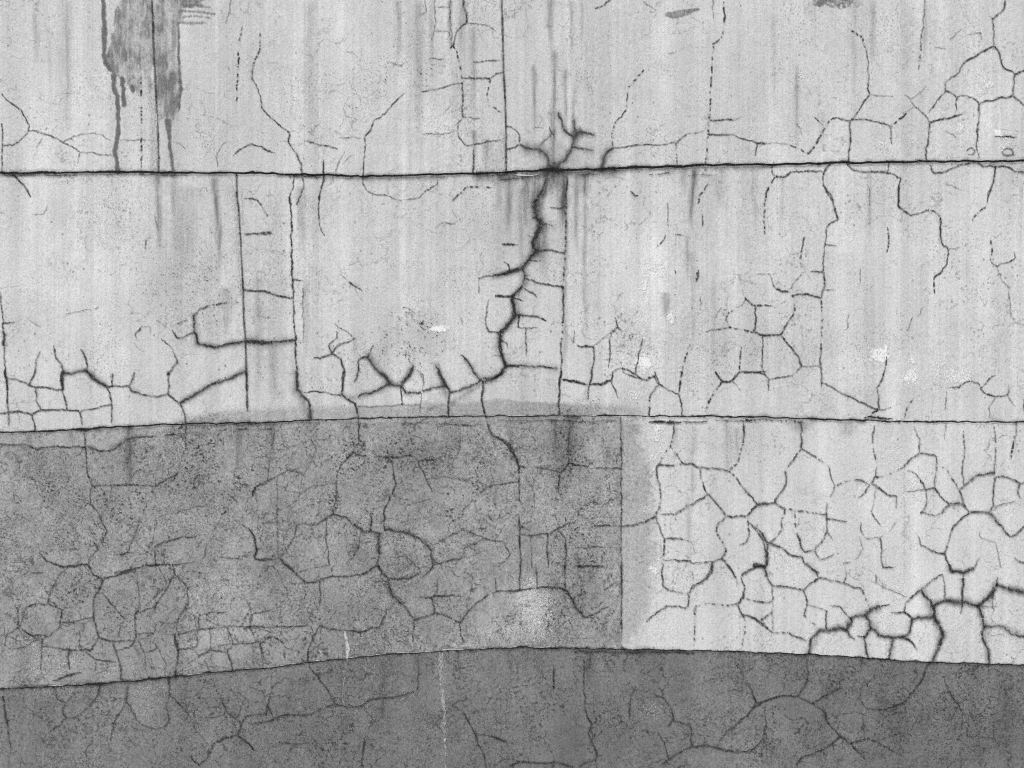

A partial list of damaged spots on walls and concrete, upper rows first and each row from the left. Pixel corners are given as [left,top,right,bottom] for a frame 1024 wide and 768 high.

crack [0,0,1024,510]
crack [0,519,420,746]
crack [191,697,311,765]
crack [243,452,608,642]
crack [430,298,1024,768]